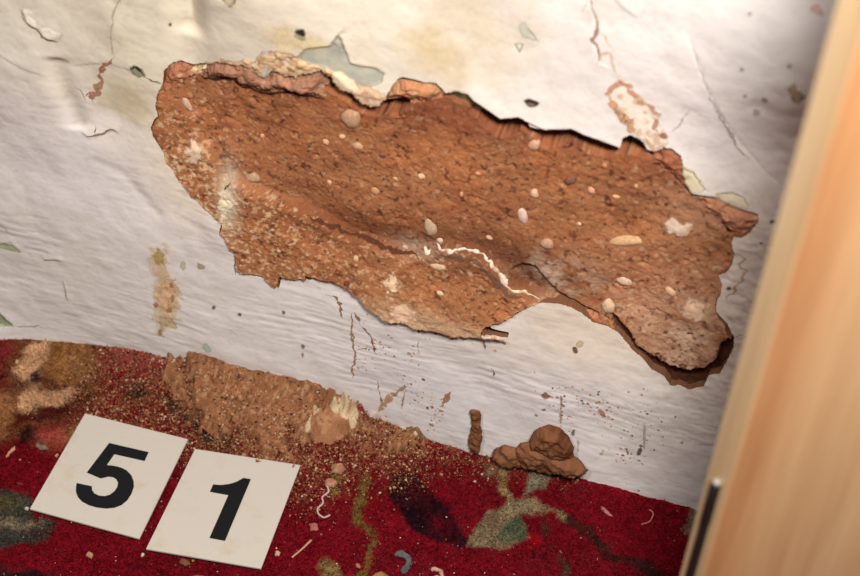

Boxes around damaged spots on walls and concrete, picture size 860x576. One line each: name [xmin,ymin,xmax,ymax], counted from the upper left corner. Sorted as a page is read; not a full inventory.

crack [110,0,121,59]
crack [582,0,618,79]
spalling [130,29,759,384]
peeling [0,314,43,328]